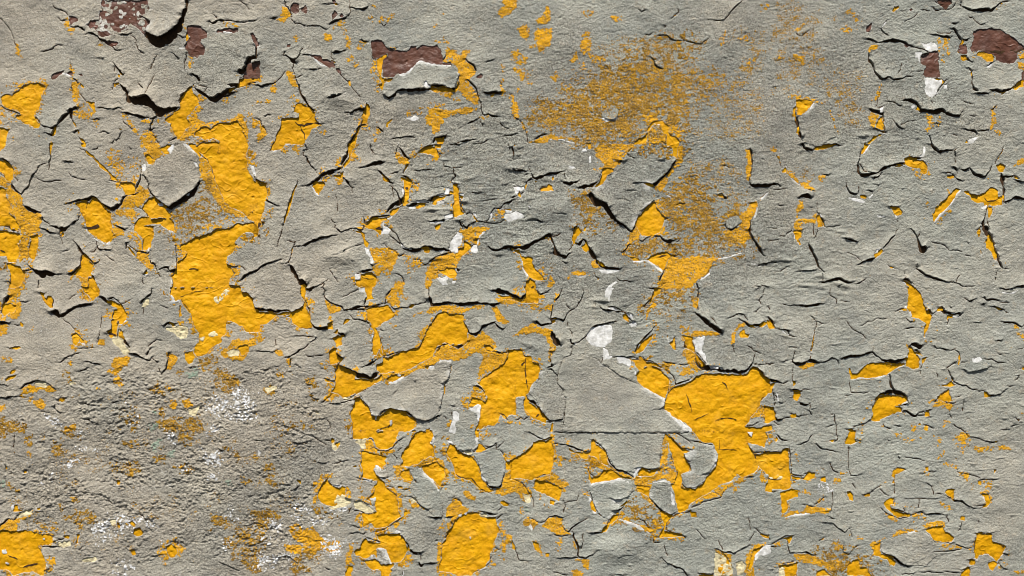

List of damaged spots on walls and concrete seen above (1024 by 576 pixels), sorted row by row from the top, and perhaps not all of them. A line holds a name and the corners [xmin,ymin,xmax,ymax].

peeling [69,0,238,58]
peeling [370,40,483,101]
peeling [957,28,1024,95]
peeling [0,71,84,290]
crack [0,380,61,413]
crack [0,147,220,382]
crack [37,0,680,575]
peeling [65,85,826,576]
crack [638,1,1024,575]
peeling [830,280,959,445]
peeling [0,505,80,576]
crack [8,539,82,571]